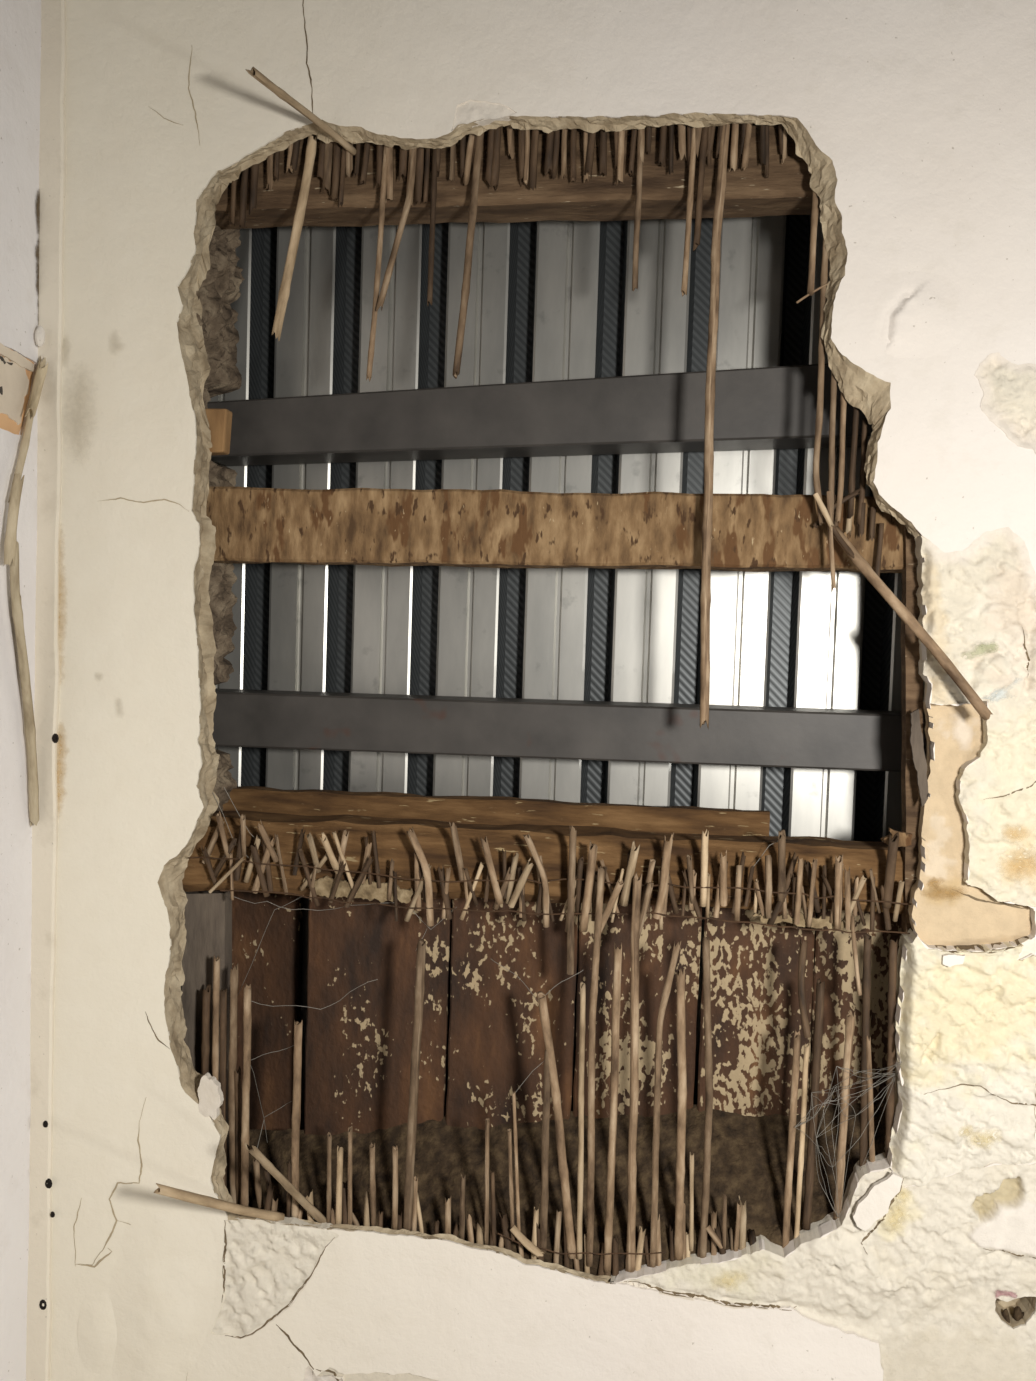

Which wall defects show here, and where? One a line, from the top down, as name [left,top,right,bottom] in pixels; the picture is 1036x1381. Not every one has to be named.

crack [302,0,313,113]
peeling [0,343,34,435]
flaking render [157,100,1036,1381]
crack [73,1099,146,1268]